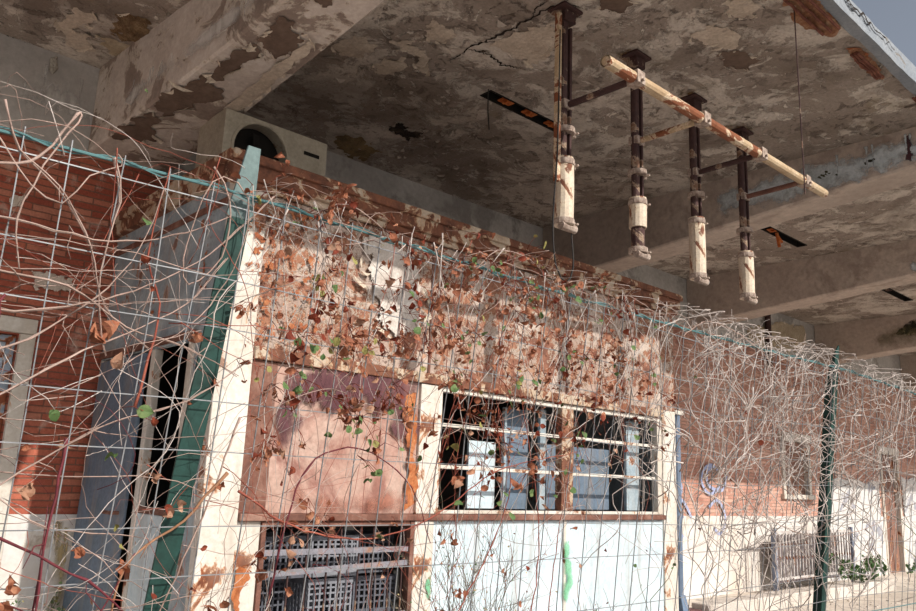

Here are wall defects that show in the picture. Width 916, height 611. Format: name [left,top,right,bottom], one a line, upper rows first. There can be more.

peeling [54,7,98,53]
peeling [110,13,315,144]
peeling [293,14,555,181]
crack [449,0,583,69]
peeling [598,0,795,126]
spalling [779,0,841,37]
spalling [847,48,885,81]
water stain [880,320,916,341]